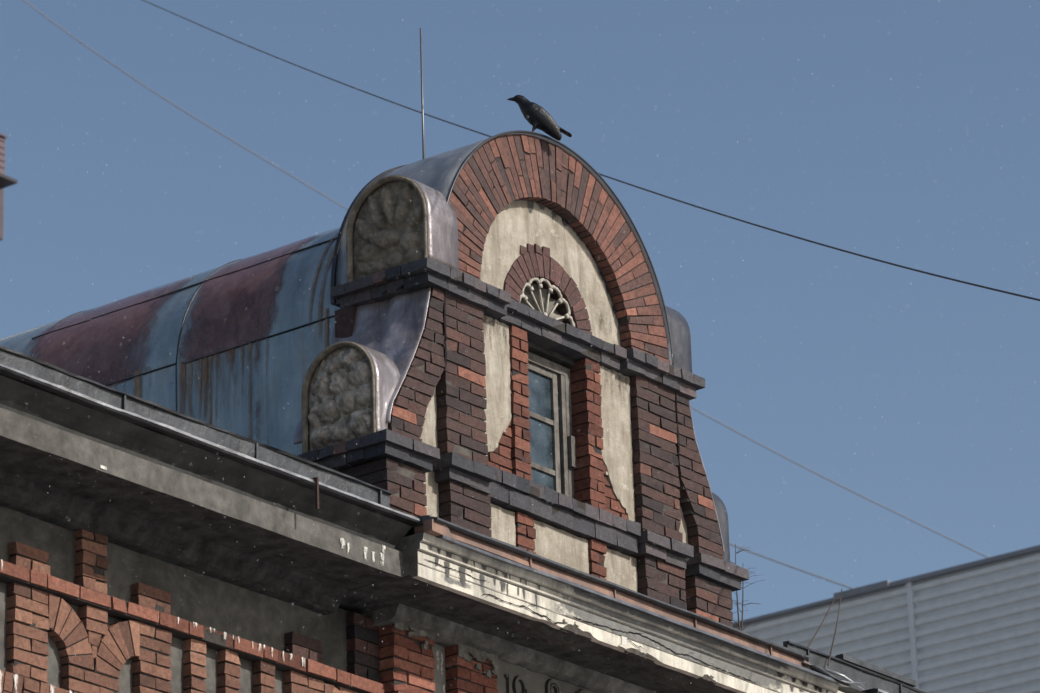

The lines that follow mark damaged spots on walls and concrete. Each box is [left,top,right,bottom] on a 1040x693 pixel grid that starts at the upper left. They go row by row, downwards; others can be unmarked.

rust [29,277,192,398]
rust [180,235,317,439]
spalling [485,421,512,473]
spalling [601,460,629,519]
peeling [457,644,499,678]
spalling [560,619,592,640]
crack [425,559,754,683]
spalling [618,644,655,663]
spalling [699,674,717,685]